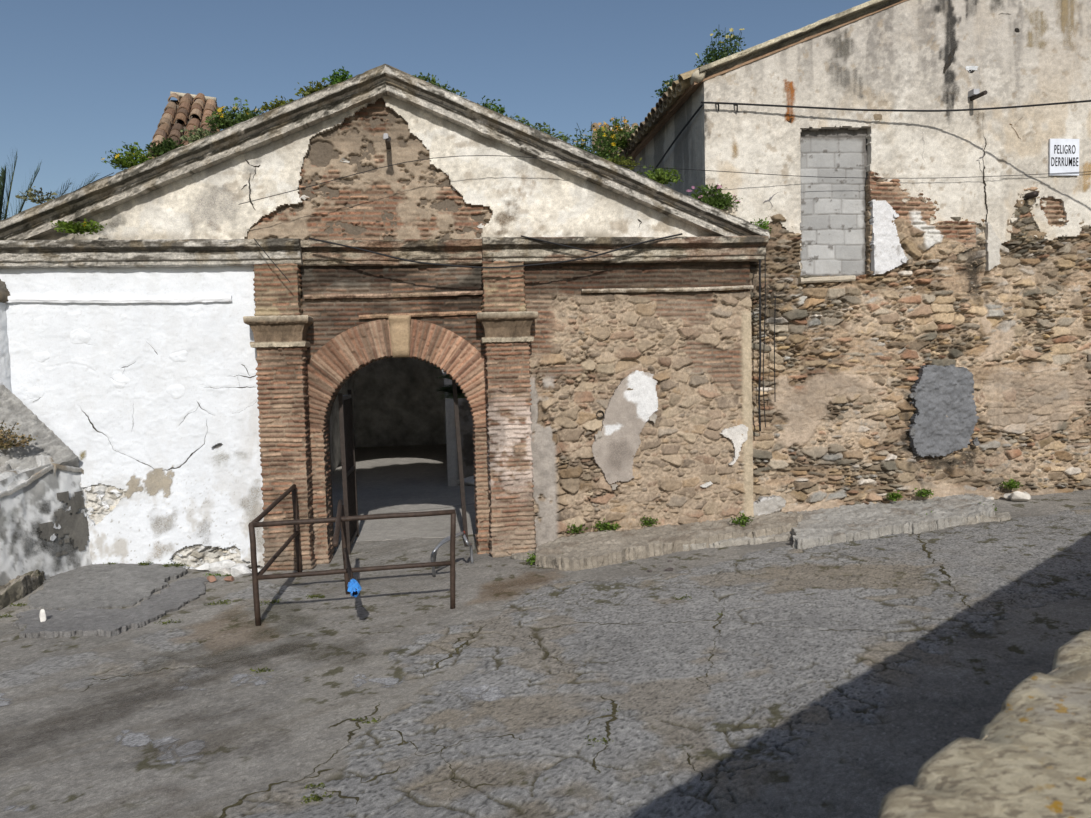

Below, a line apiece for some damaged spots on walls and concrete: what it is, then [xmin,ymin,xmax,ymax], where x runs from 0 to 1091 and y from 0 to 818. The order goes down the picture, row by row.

rust [785,81,795,122]
damp [935,0,977,115]
spalling [245,98,493,240]
spalling [867,171,1069,276]
crack [83,364,257,471]
spalling [39,466,174,557]
crack [73,655,260,692]
crack [422,618,501,677]
crack [528,596,900,688]
crack [219,704,545,818]
crack [587,696,618,775]